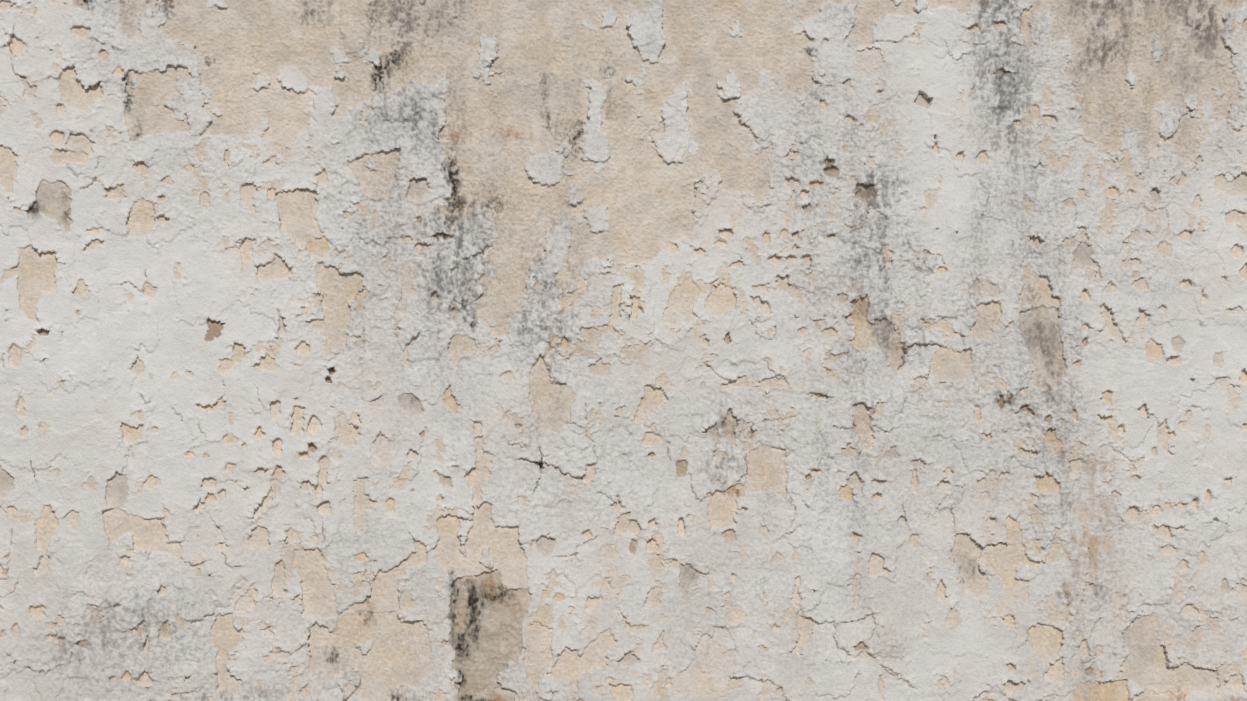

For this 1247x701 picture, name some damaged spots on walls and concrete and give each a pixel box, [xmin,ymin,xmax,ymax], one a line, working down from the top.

leakage [1093,0,1154,62]
leakage [425,160,503,327]
peeling [0,461,80,579]
peeling [81,411,228,589]
peeling [130,614,186,653]
leakage [450,571,513,701]
peeling [763,546,824,655]